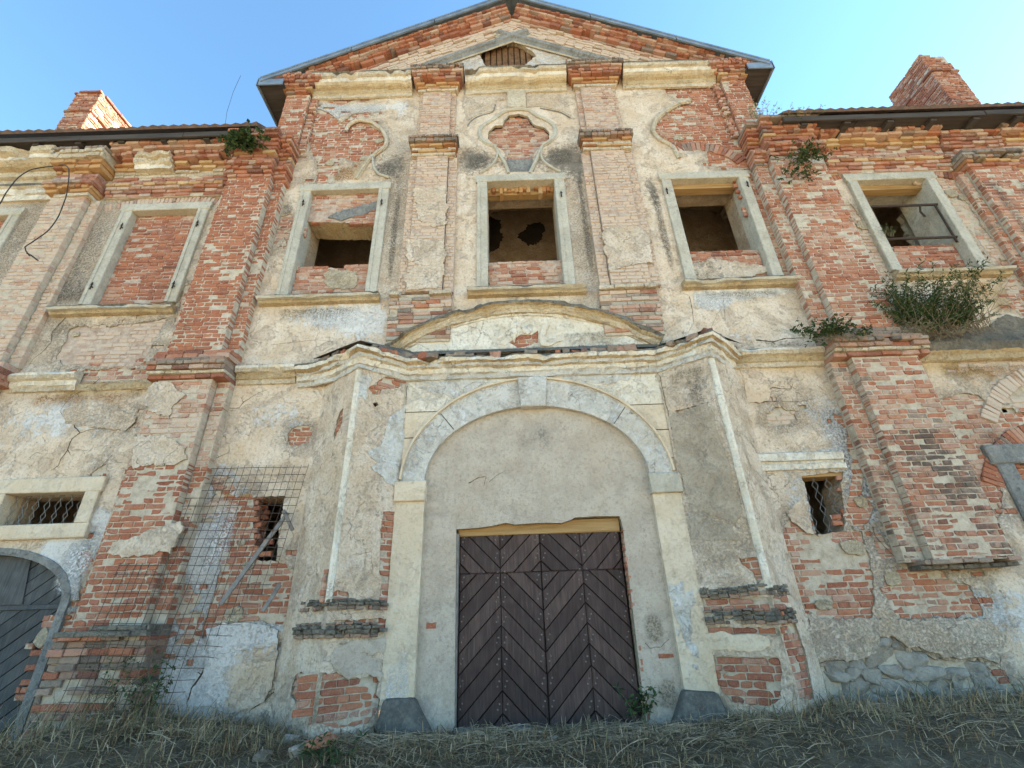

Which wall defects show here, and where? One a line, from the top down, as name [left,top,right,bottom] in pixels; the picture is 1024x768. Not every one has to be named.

crack [50,378,100,471]
flaking render [490,331,538,357]
flaking render [940,385,1024,518]
flaking render [14,533,94,701]
peeling [107,521,185,558]
flaking render [164,476,297,666]
flaking render [292,511,395,728]
flaking render [668,402,994,710]